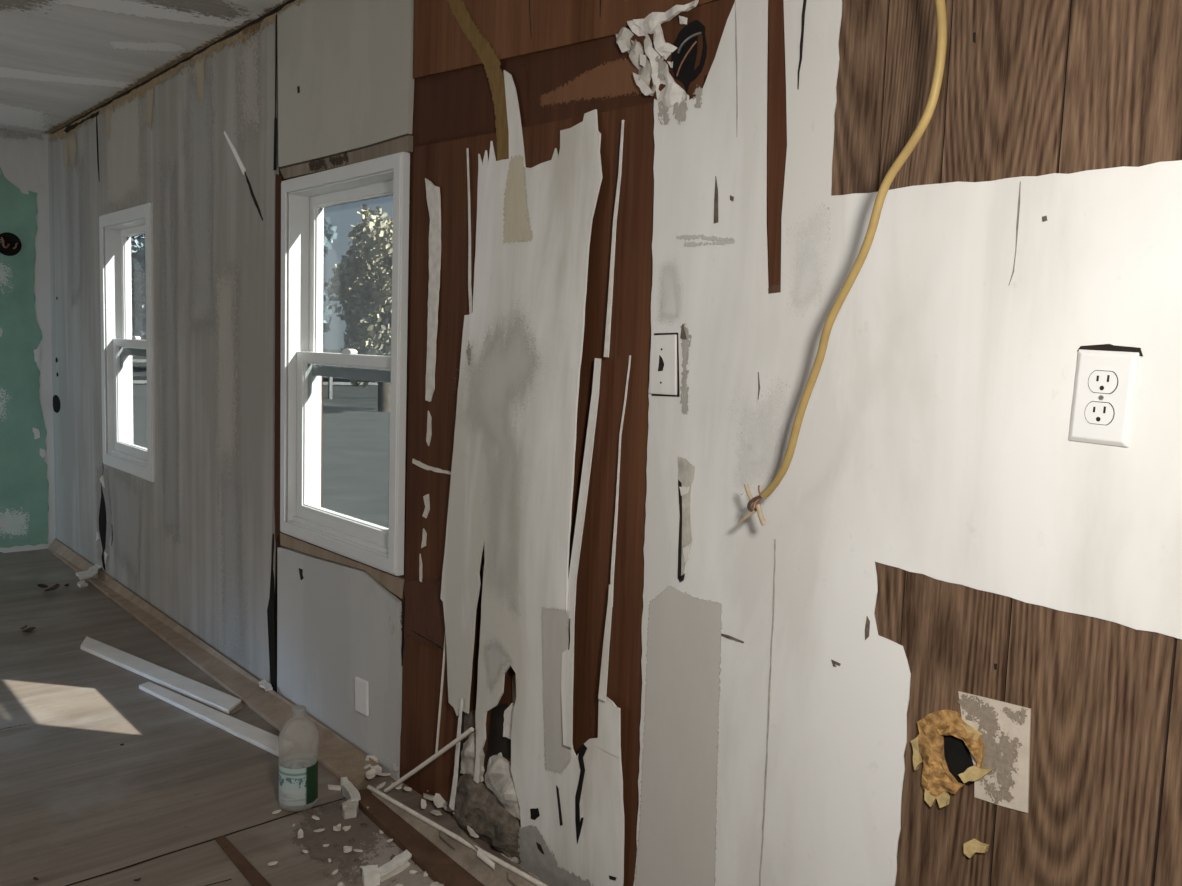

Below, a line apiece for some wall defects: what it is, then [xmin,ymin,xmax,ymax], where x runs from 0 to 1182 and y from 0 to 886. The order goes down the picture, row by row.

peeling [0,168,61,548]
damp [0,0,304,665]
damp [309,151,348,172]
flaking render [453,703,540,880]